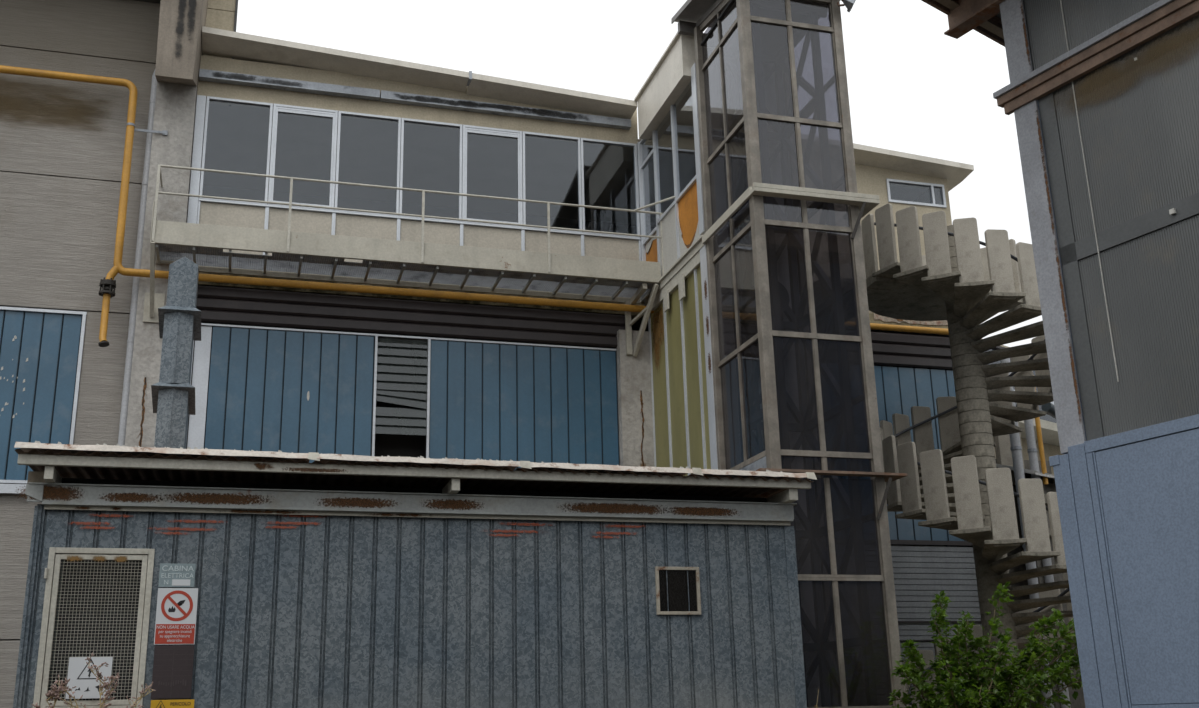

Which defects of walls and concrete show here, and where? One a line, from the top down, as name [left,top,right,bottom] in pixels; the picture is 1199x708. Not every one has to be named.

leakage [175,0,196,56]
leakage [0,80,92,124]
rust [16,486,299,514]
rust [316,497,484,517]
rust [558,502,740,516]